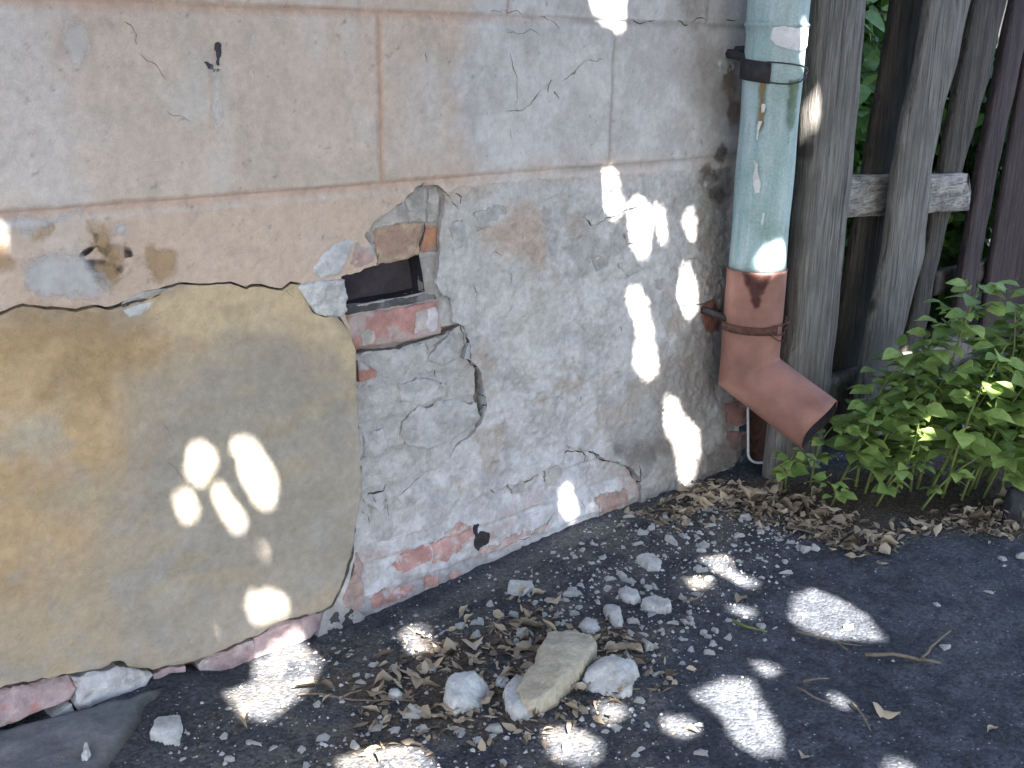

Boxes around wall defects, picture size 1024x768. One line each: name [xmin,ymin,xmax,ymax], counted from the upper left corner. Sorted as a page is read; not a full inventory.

crack [492,10,610,138]
crack [22,281,297,317]
crack [455,323,487,417]
flaking render [0,167,747,727]
crack [552,450,642,485]